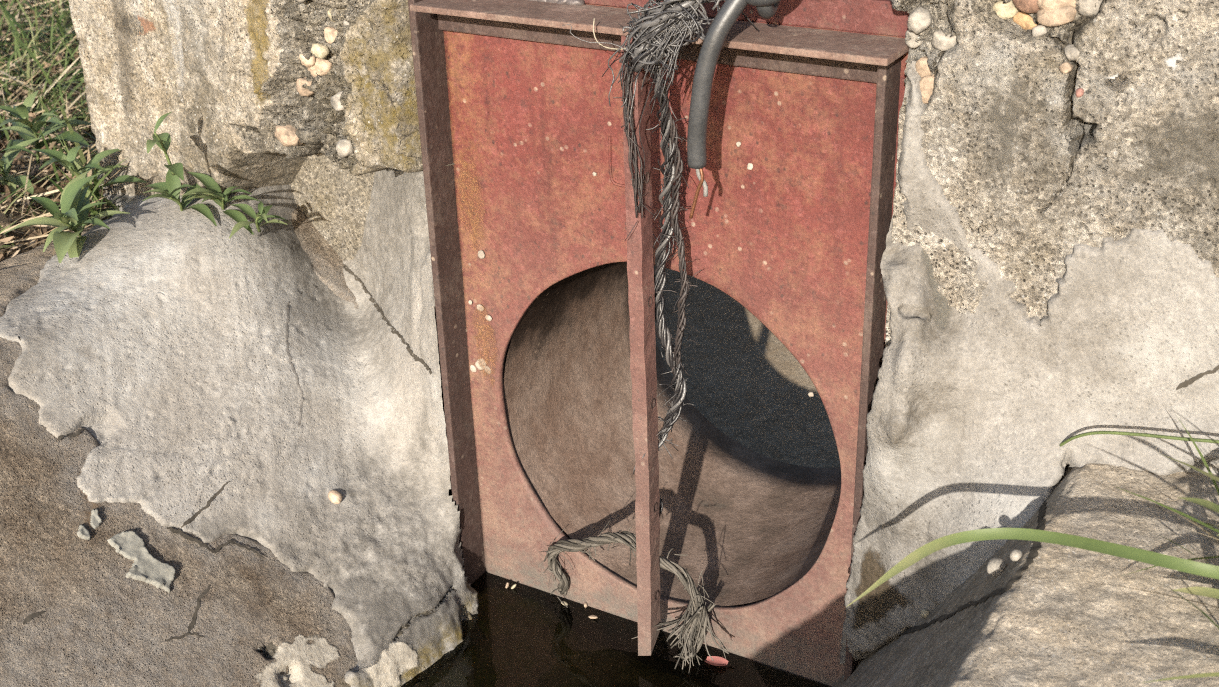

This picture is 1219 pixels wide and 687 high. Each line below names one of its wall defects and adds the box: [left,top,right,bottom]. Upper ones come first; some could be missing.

crack [900,0,916,8]
crack [932,32,951,77]
spalling [892,0,1107,114]
spalling [229,0,375,175]
crack [1040,0,1100,214]
spalling [1068,116,1096,155]
peeling [77,509,102,540]
crack [167,481,264,558]
peeling [107,531,176,593]
crack [167,585,210,642]
spalling [257,642,278,659]